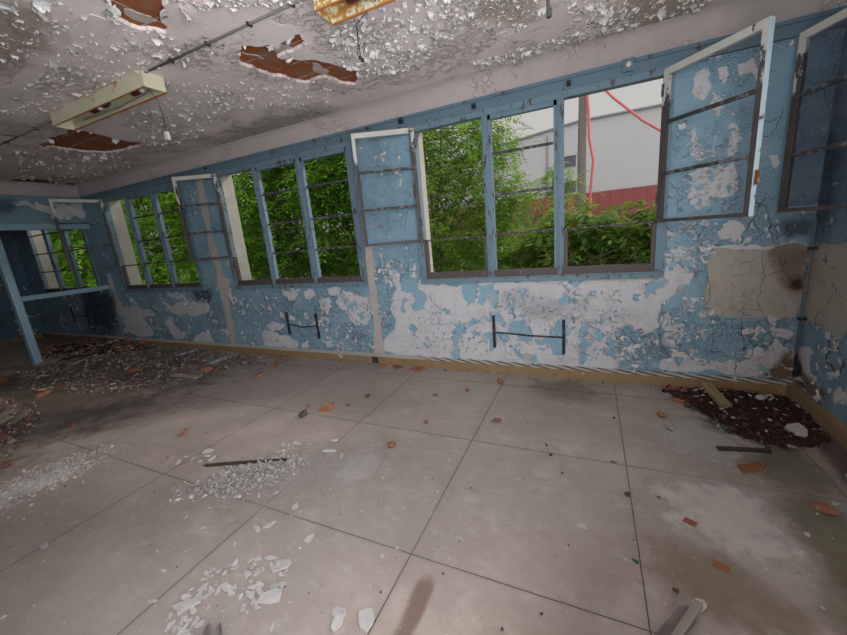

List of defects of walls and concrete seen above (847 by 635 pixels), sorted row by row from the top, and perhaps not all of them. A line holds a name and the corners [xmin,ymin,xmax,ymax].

spalling [0,0,546,186]
peeling [472,0,712,72]
peeling [106,273,225,342]
peeling [231,55,847,405]
crack [693,196,805,370]